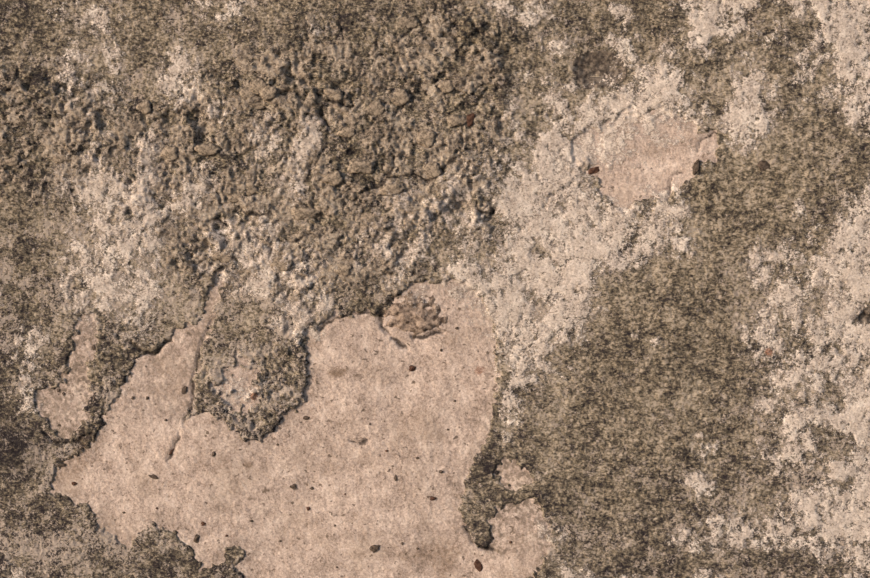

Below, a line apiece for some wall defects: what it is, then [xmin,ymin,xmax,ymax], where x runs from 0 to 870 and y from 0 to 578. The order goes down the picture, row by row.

spalling [0,0,553,578]
leakage [47,0,870,445]
leakage [554,554,596,578]
leakage [665,168,870,578]